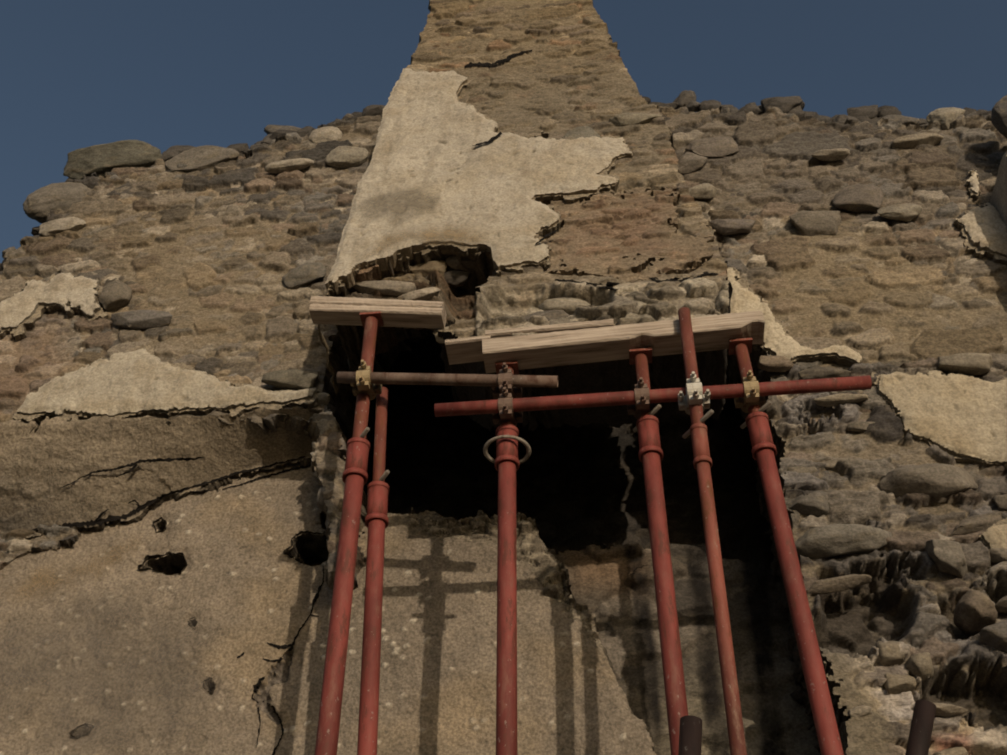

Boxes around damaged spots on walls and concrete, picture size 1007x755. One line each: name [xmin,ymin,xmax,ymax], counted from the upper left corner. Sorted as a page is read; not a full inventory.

flaking render [325,68,714,295]
flaking render [953,169,1007,265]
flaking render [0,269,108,341]
flaking render [727,266,863,367]
flaking render [12,345,319,423]
flaking render [871,370,1007,470]
crack [32,456,311,532]
spalling [137,551,188,575]
spalling [283,530,329,566]
crack [237,567,324,755]